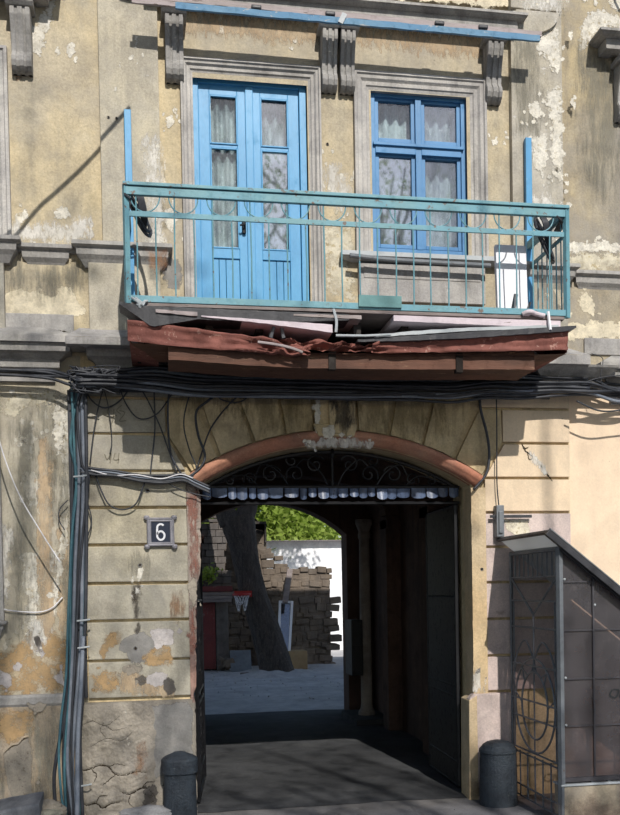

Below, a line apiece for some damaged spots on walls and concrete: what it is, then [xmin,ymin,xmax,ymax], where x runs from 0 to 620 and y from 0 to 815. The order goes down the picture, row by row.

flaking render [32,0,78,63]
flaking render [420,0,569,12]
flaking render [536,0,620,74]
flaking render [520,84,577,207]
flaking render [12,203,94,244]
flaking render [144,197,178,243]
flaking render [570,235,620,271]
flaking render [568,288,620,342]
crack [522,445,552,481]
flaking render [0,386,70,695]
flaking render [91,489,202,698]
crack [83,763,156,809]